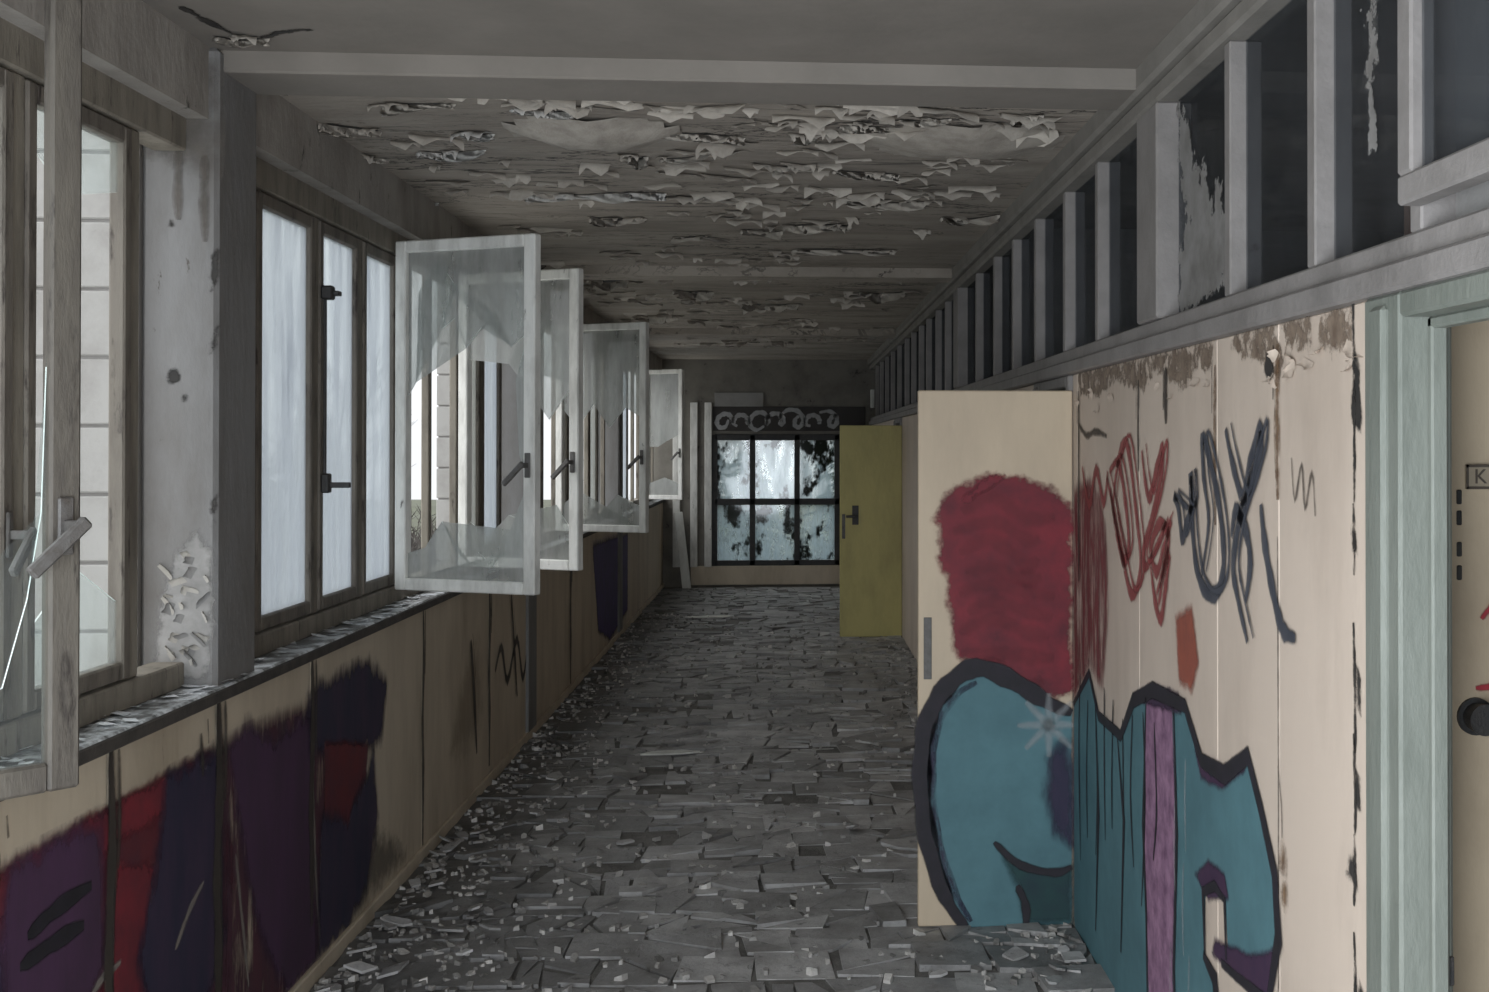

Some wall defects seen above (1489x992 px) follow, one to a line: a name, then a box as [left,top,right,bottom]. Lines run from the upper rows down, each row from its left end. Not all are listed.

peeling [318,98,1062,350]
peeling [155,532,216,679]